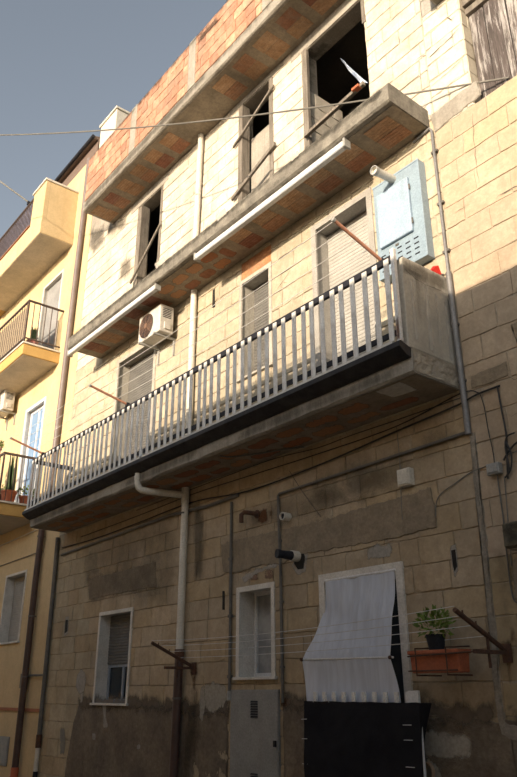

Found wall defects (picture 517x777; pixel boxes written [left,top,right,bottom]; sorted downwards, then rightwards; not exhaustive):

peeling [199,681,227,721]
peeling [424,730,471,777]